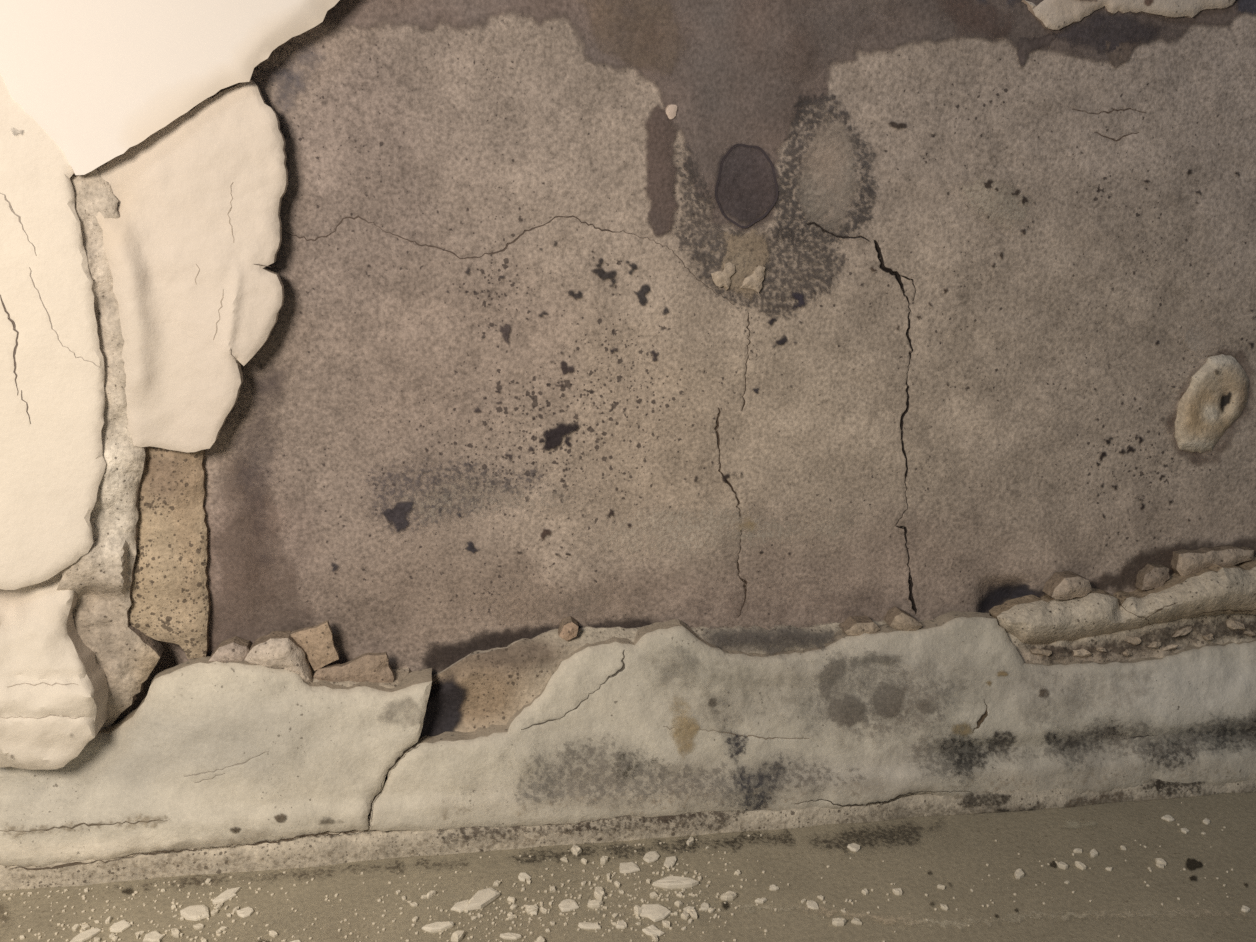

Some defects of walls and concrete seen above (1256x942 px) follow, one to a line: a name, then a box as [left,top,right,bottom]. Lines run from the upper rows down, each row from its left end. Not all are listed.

leakage [323,0,1256,325]
crack [0,295,31,424]
crack [0,193,99,367]
peeling [0,0,432,867]
leakage [500,325,510,343]
crack [285,216,750,618]
crack [807,222,917,614]
spalling [1169,352,1250,463]
crack [521,651,625,730]
peeling [368,555,1256,834]
leakage [816,654,1018,777]
leakage [1045,713,1256,796]